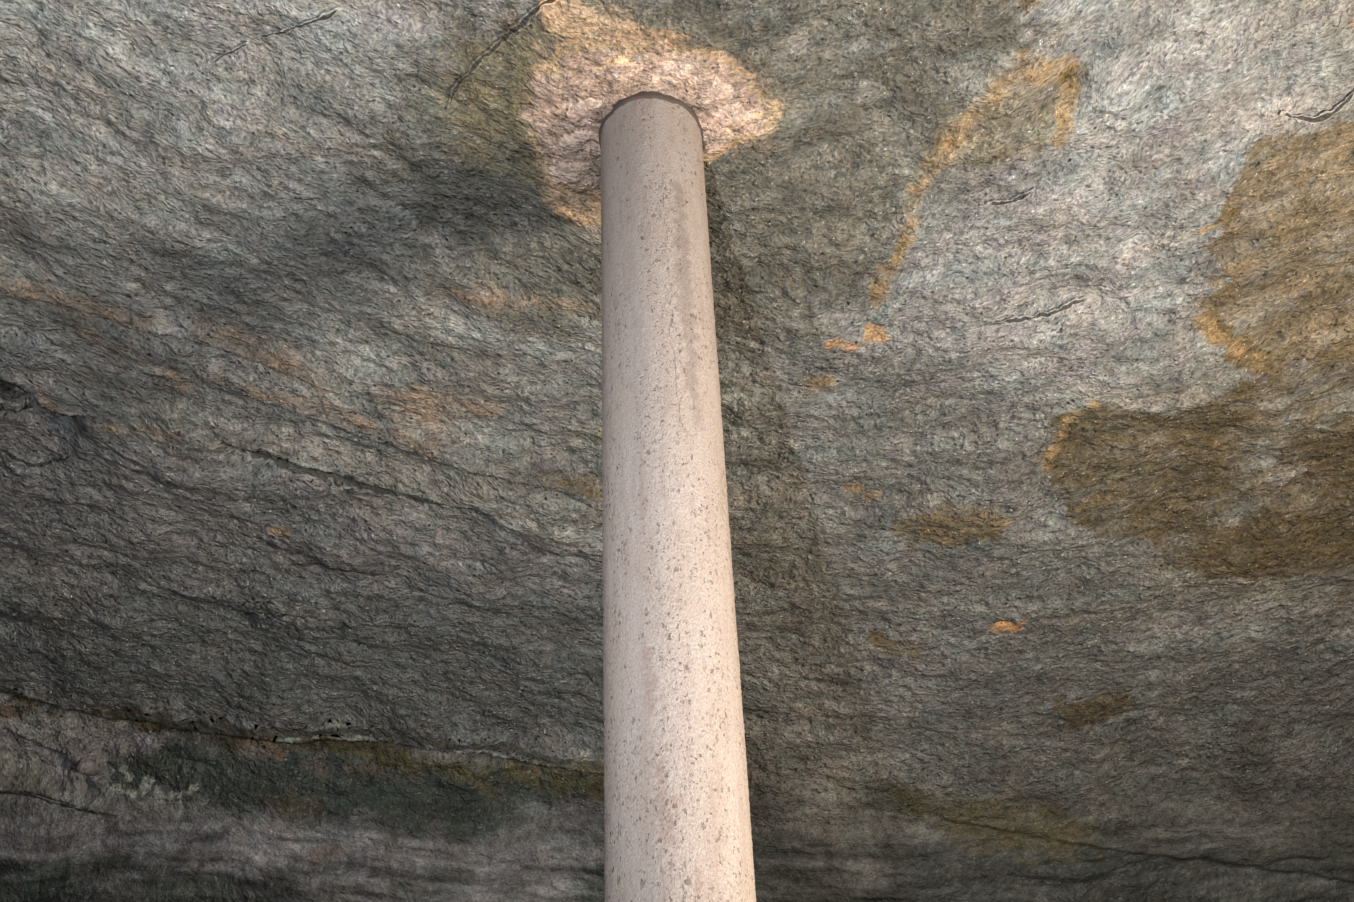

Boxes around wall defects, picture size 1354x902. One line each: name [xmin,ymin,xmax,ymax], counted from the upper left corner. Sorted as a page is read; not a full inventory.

spalling [516,0,784,227]
corrosion [814,45,1101,354]
corrosion [795,370,841,395]
crack [0,787,99,814]